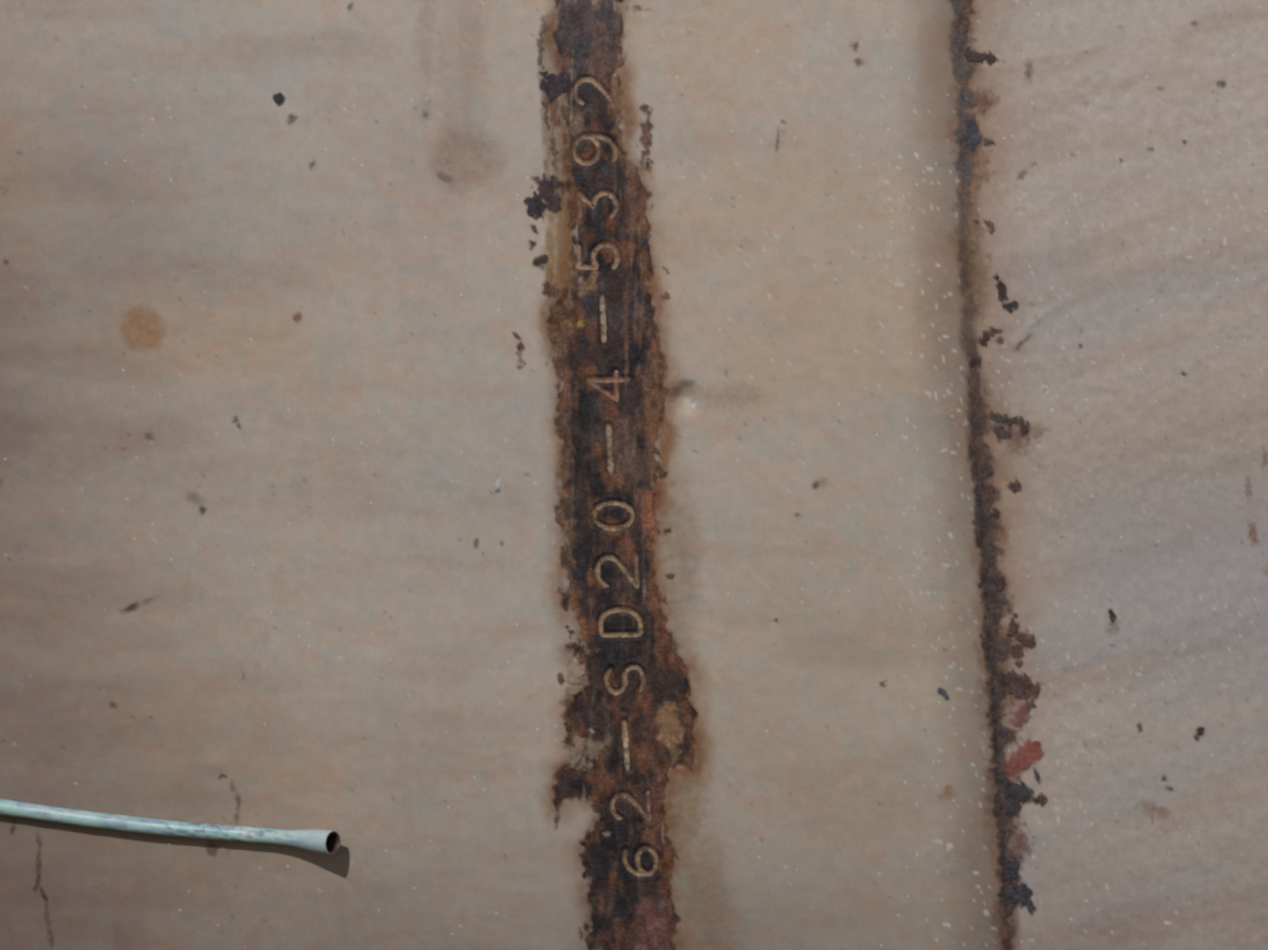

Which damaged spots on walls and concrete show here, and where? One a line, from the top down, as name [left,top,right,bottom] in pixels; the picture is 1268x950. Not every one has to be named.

corrosion [951,0,998,205]
corrosion [512,332,526,368]
corrosion [953,219,1018,314]
corrosion [524,0,706,950]
corrosion [966,327,1047,950]